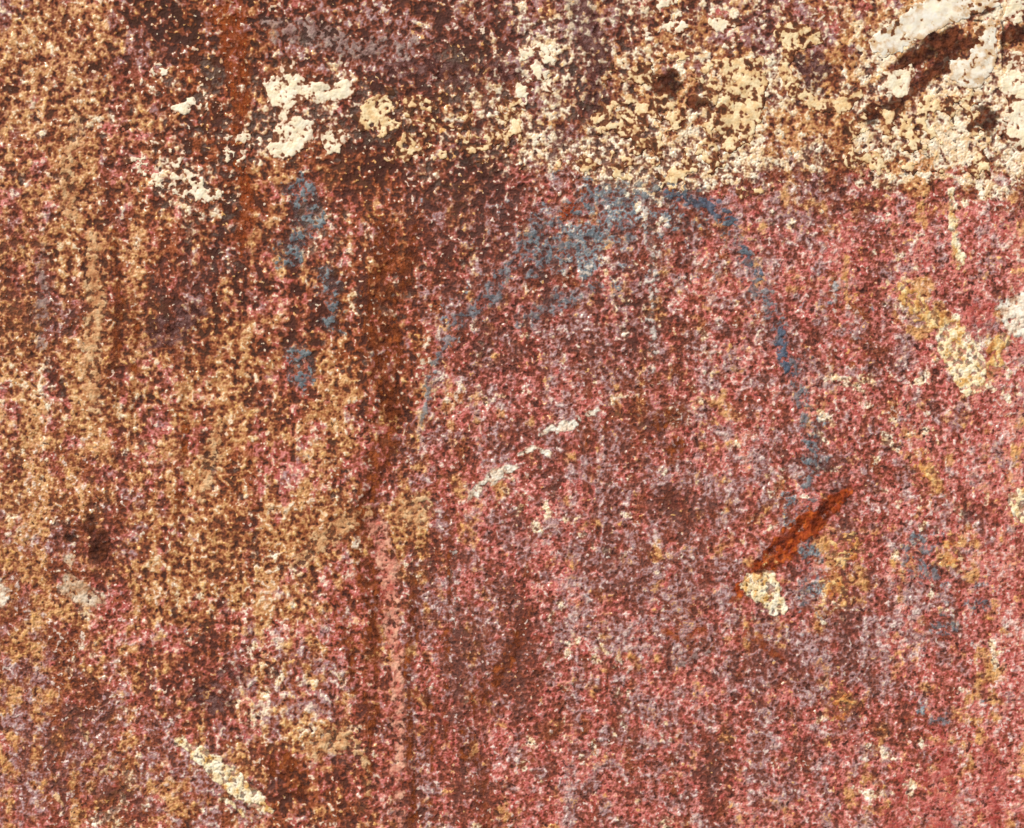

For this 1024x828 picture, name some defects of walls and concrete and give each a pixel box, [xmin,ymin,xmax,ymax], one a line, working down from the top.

peeling [262,41,556,166]
peeling [554,0,1024,192]
peeling [718,178,782,200]
corrosion [732,485,863,611]
corrosion [825,691,861,721]